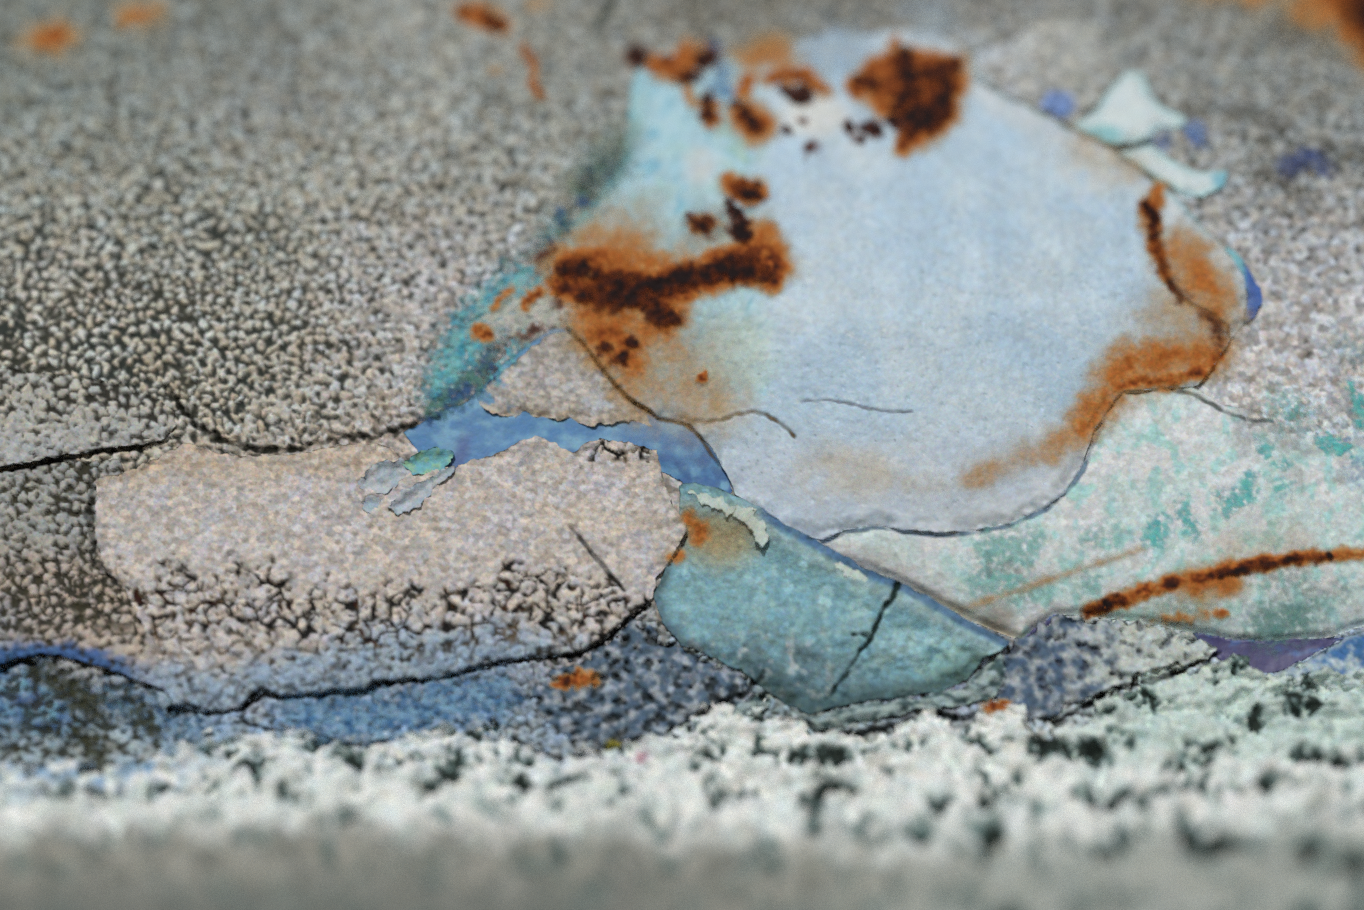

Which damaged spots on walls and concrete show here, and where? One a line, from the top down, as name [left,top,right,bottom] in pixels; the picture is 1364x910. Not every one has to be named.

corrosion [453,0,549,100]
corrosion [625,32,971,158]
peeling [0,14,1262,715]
corrosion [470,170,795,427]
corrosion [964,181,1248,487]
crack [4,441,154,472]
crack [172,395,441,454]
crack [166,533,645,749]
crack [832,581,901,694]
corrosion [1082,544,1364,625]
crack [779,710,984,738]
crack [1022,652,1221,748]